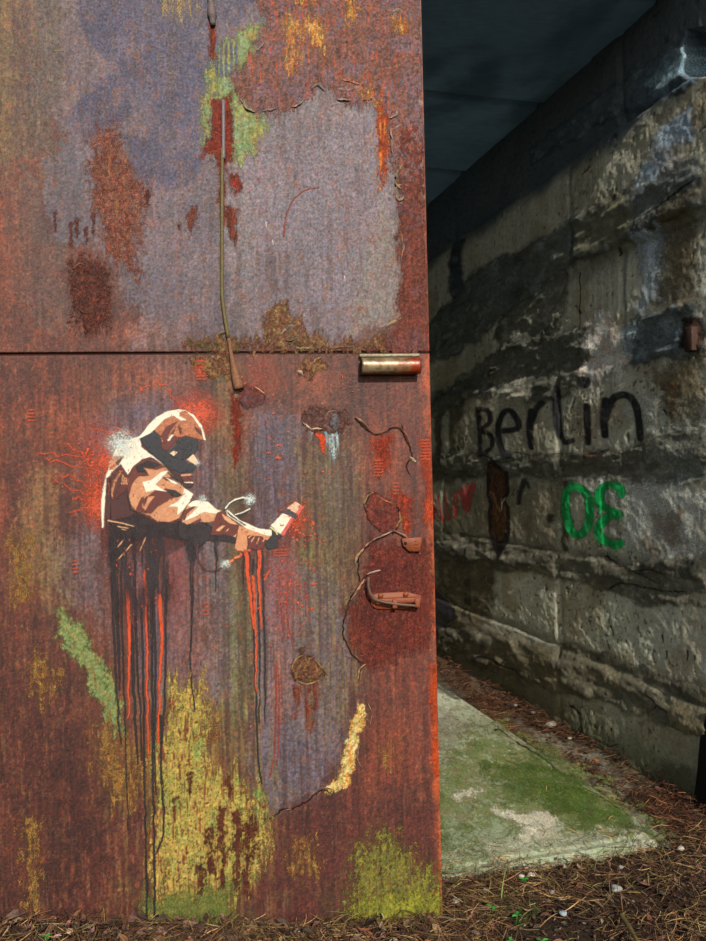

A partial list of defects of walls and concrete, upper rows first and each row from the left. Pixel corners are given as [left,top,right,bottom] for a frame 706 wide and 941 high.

corrosion [208,24,217,59]
corrosion [69,116,155,292]
corrosion [201,92,243,246]
peeling [182,0,429,382]
corrosion [374,98,392,191]
water stain [573,107,701,393]
corrosion [229,389,244,468]
peeling [301,405,352,459]
crack [355,417,416,474]
water stain [623,349,706,435]
crack [342,530,408,680]
corrosion [344,434,435,673]